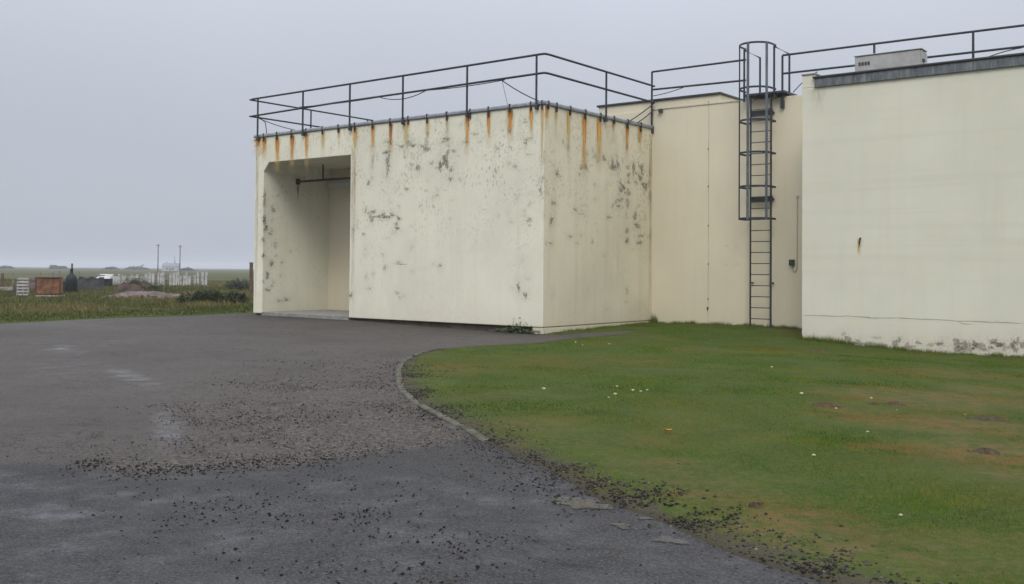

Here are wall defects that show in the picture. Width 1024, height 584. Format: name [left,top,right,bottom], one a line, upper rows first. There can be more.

rust [530,107,570,140]
rust [583,117,641,155]
crack [903,317,1019,325]